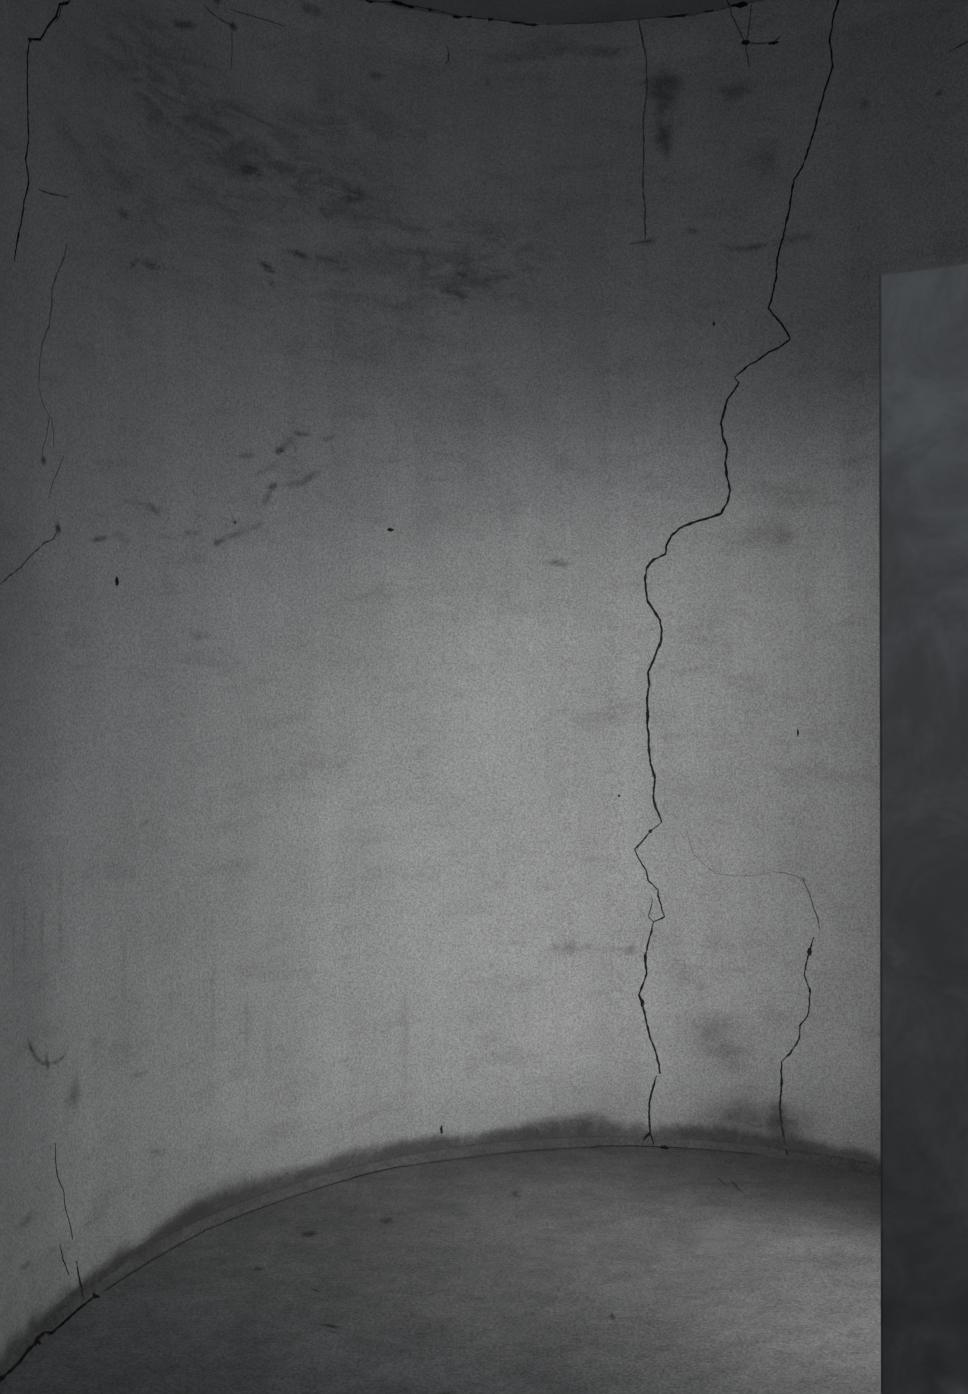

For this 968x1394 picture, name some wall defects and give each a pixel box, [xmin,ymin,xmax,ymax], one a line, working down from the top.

crack [14,0,70,262]
crack [203,0,284,69]
crack [365,0,781,245]
crack [0,244,67,585]
crack [634,0,839,1155]